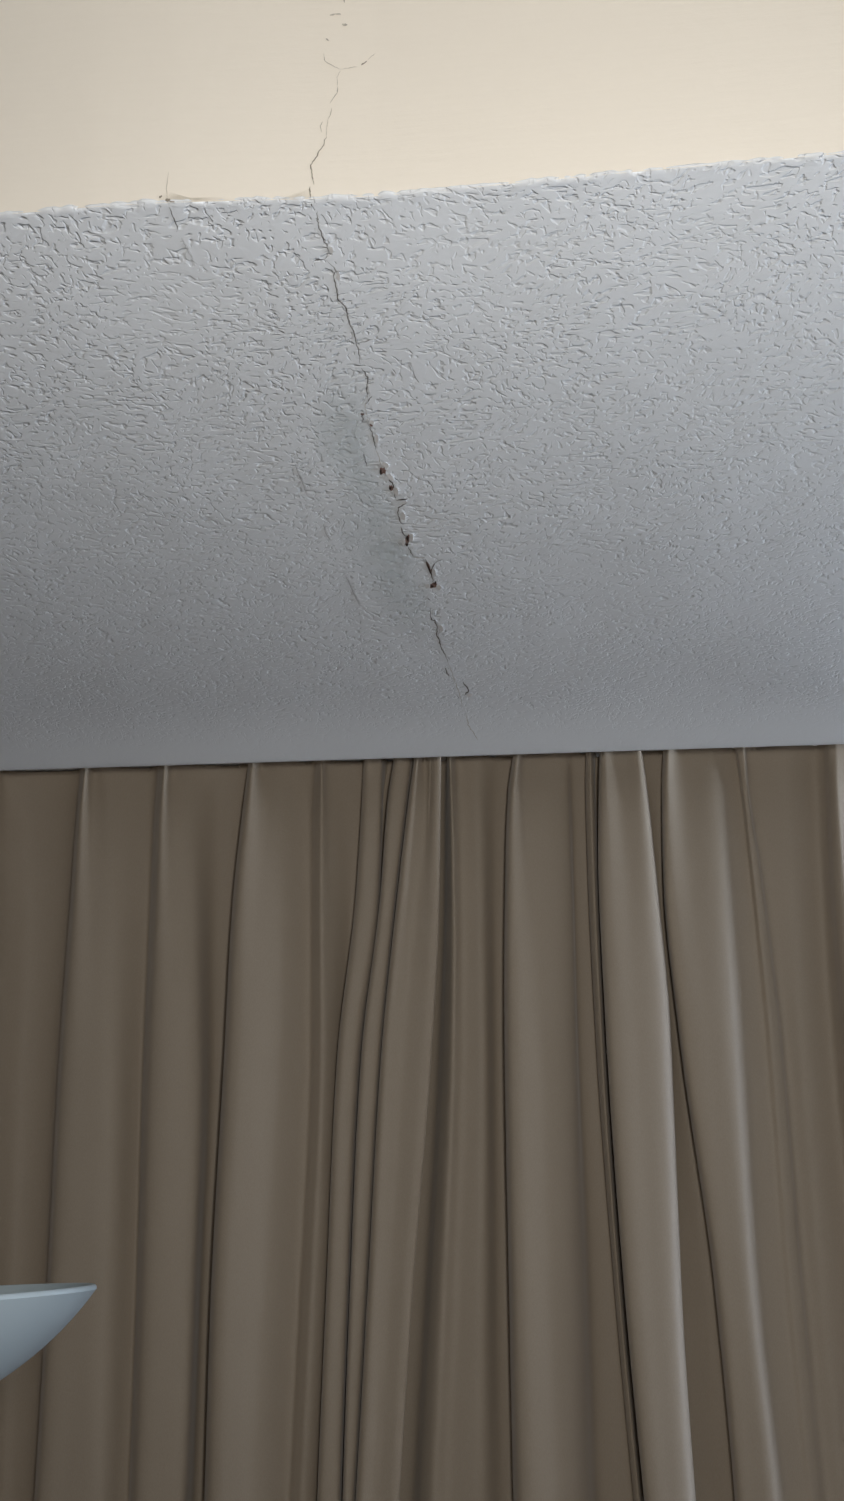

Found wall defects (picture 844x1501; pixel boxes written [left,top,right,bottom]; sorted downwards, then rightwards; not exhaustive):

crack [309,0,478,740]